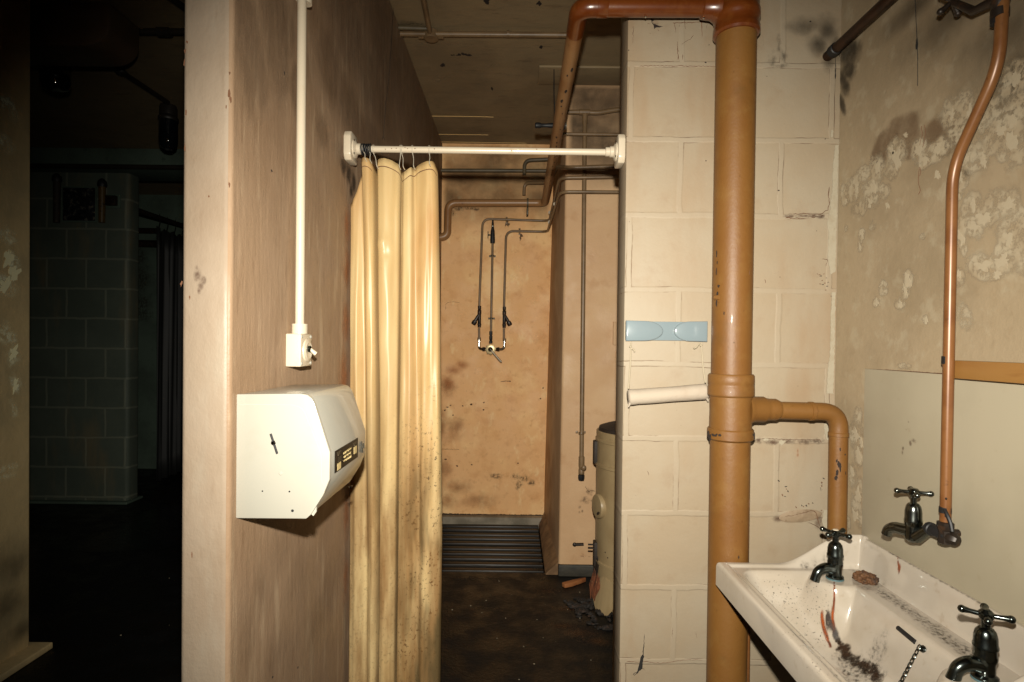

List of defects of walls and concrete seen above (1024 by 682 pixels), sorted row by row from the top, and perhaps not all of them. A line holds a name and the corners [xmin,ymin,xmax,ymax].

peeling [840,59,1024,285]
crack [786,190,830,219]
peeling [873,269,913,309]